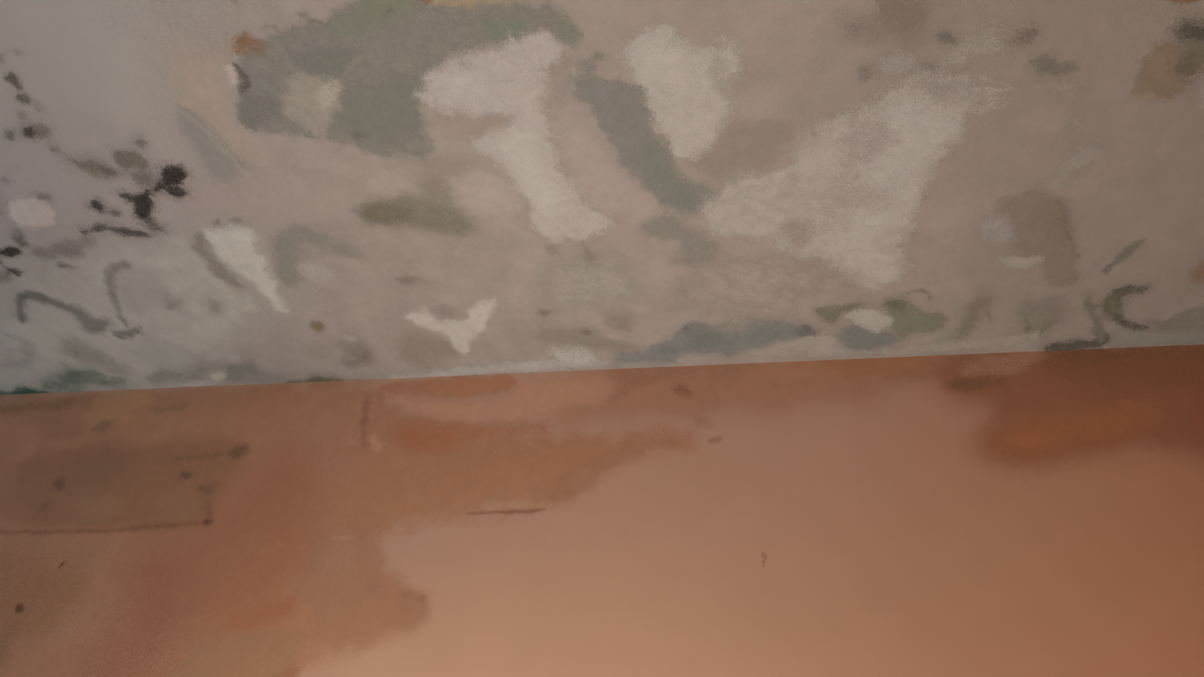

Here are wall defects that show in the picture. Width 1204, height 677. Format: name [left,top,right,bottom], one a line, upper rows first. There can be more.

water stain [0,0,1204,434]